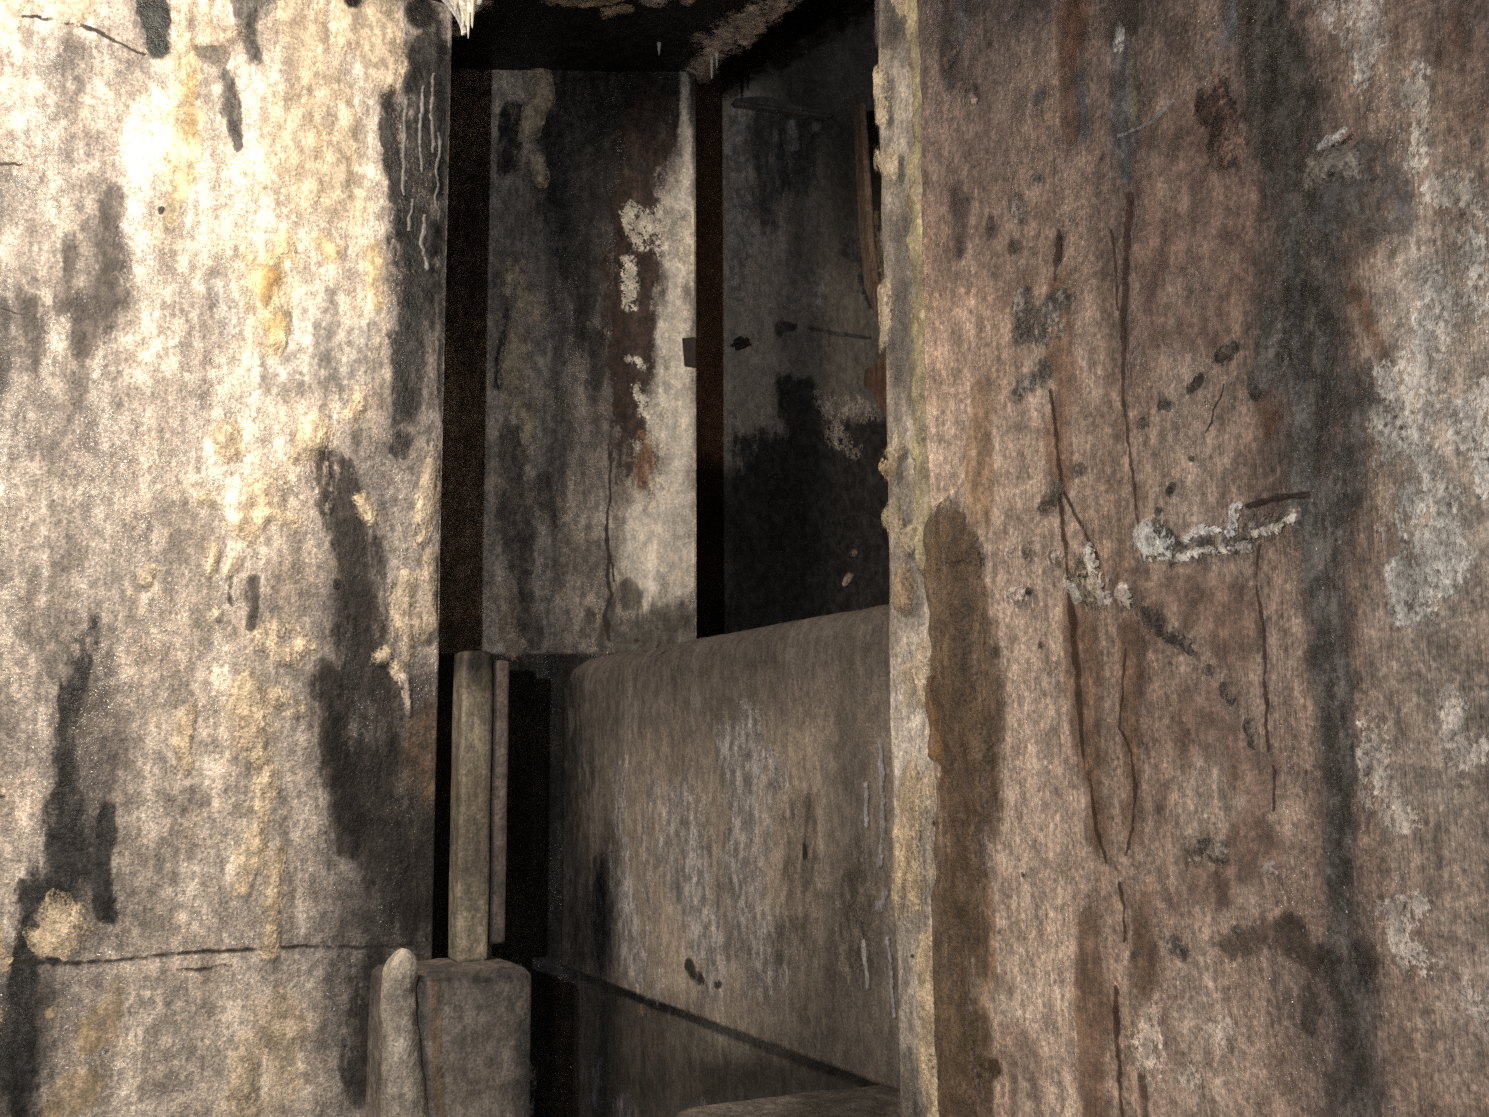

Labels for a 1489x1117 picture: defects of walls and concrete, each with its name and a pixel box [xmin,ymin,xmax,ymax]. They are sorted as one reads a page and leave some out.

crack [0,160,22,168]
water stain [0,186,130,393]
water stain [204,0,492,961]
water stain [496,68,693,420]
water stain [560,374,1016,1117]
water stain [872,67,890,127]
crack [1053,229,1061,282]
crack [1049,389,1137,943]
crack [1110,192,1139,525]
water stain [1217,0,1489,1117]
crack [11,942,414,971]
crack [1112,985,1123,1117]